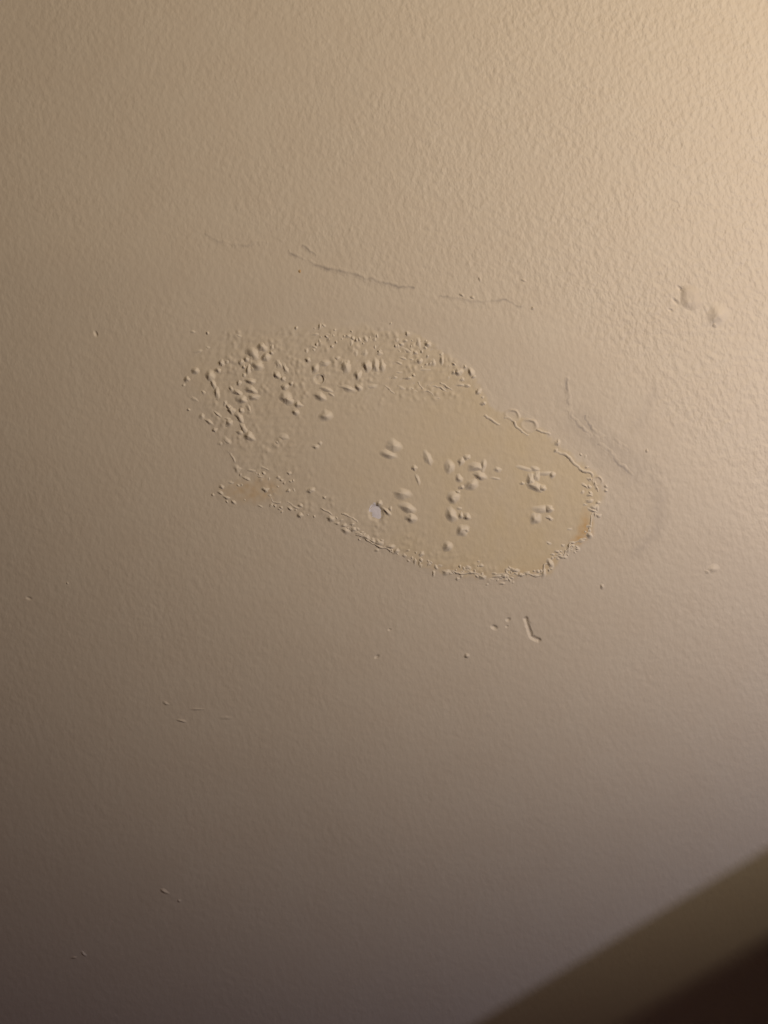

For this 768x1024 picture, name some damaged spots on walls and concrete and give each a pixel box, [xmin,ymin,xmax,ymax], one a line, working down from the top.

crack [204,231,415,290]